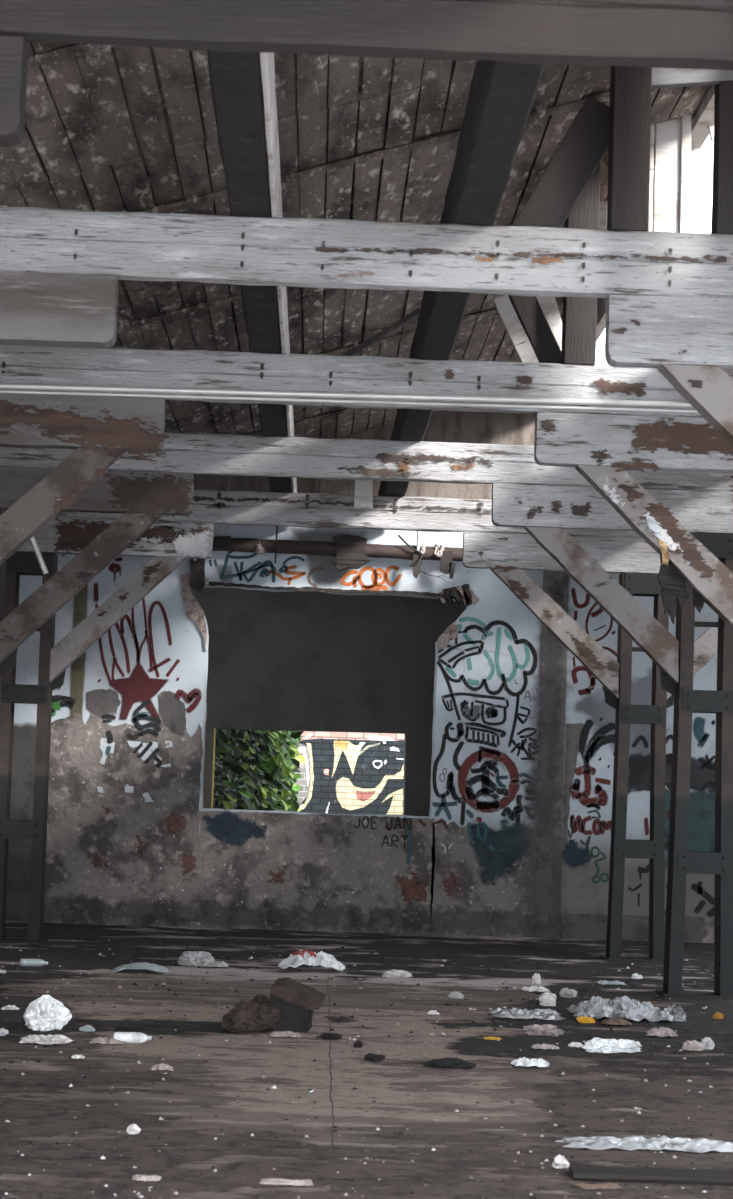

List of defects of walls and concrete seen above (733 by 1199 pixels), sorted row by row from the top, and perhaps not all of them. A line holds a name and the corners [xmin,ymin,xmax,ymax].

peeling [315,247,727,265]
peeling [540,419,557,435]
peeling [514,497,593,519]
peeling [591,417,733,581]
flaking render [43,688,534,938]